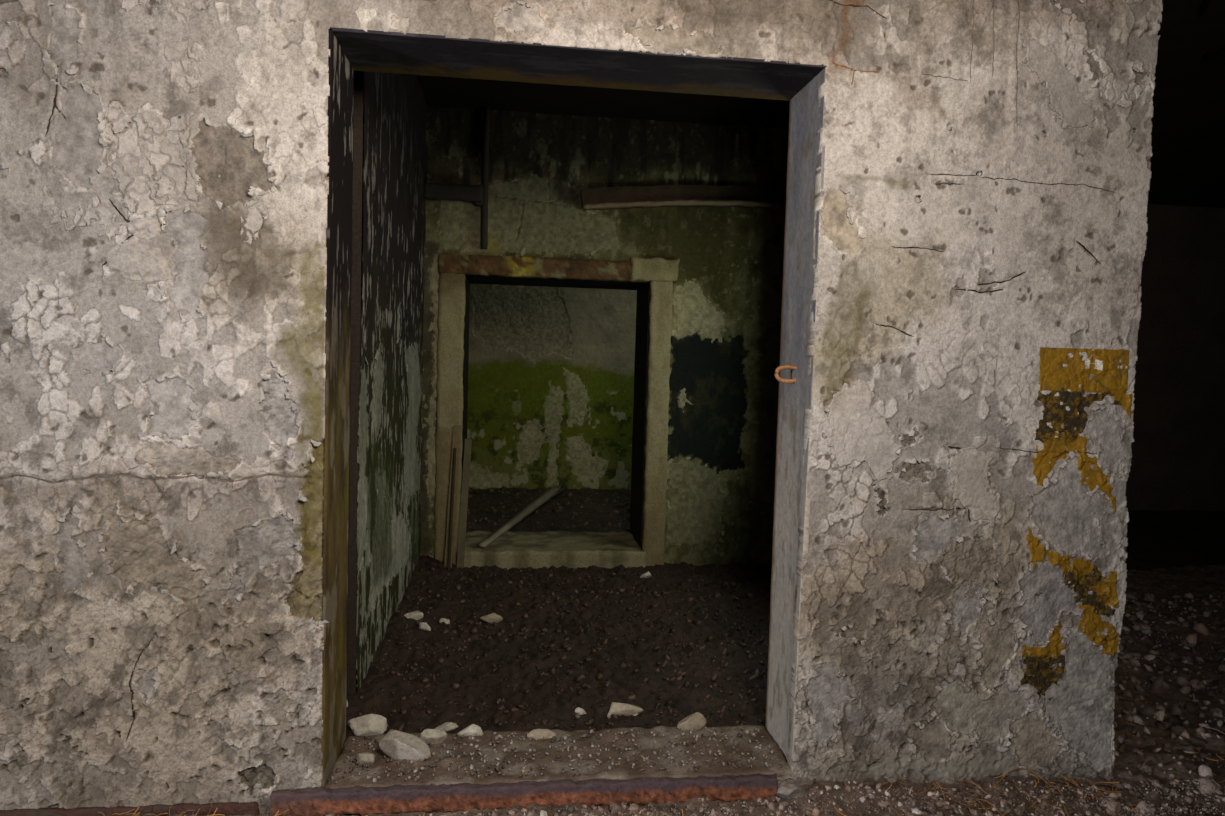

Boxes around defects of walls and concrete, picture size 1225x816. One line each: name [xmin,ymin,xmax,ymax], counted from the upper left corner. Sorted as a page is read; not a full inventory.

peeling [37,0,278,322]
peeling [72,334,123,376]
peeling [1082,352,1103,371]
peeling [822,382,1002,563]
peeling [906,397,1128,772]